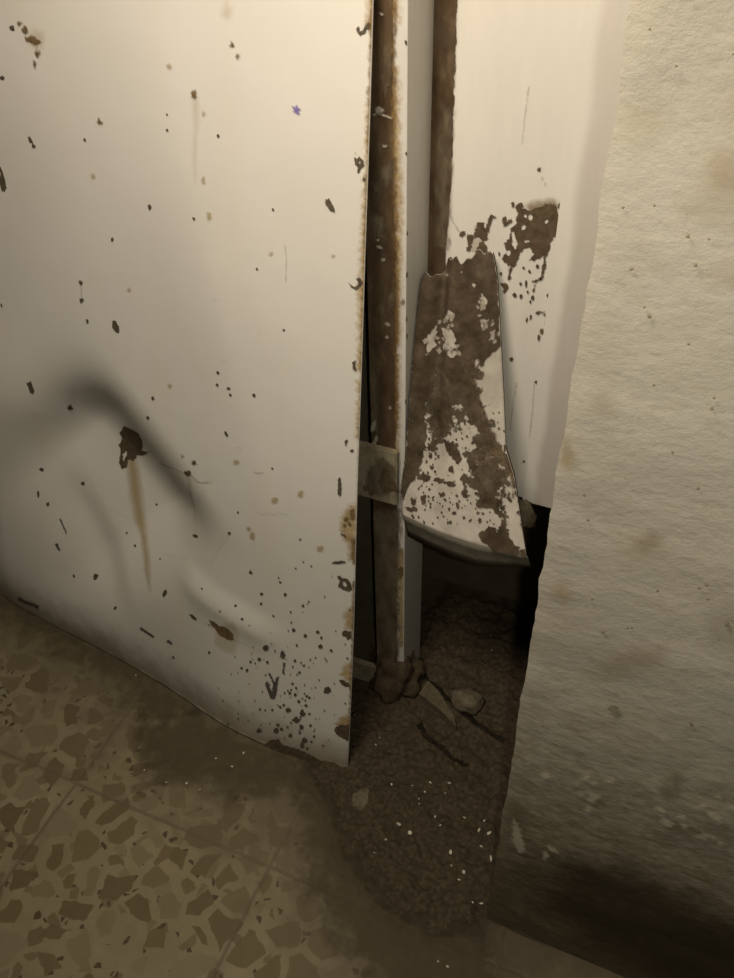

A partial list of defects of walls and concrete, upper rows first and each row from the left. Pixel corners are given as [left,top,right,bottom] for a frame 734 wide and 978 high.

rust [358,0,560,664]
rust [118,426,148,540]
rust [340,506,356,564]
peeling [404,411,507,525]
peeling [231,601,355,754]
leakage [564,871,734,978]